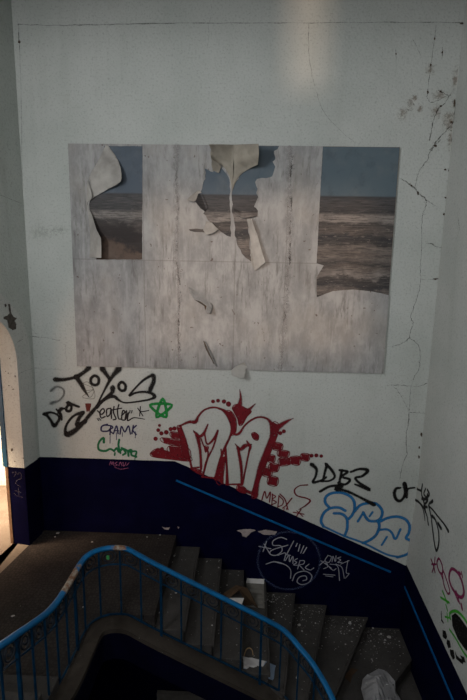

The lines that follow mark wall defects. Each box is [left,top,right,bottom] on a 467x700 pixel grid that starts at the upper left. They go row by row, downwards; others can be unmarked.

peeling [237,529,277,537]